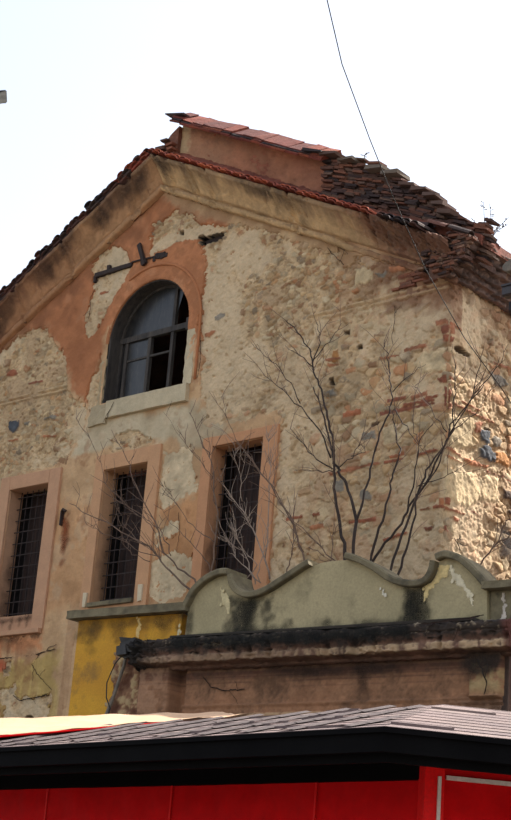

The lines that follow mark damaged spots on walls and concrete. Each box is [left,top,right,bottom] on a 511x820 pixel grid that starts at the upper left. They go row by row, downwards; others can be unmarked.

flaking render [84,246,132,338]
flaking render [0,328,102,488]
flaking render [149,210,511,606]
peeling [220,587,231,614]
damp [229,597,256,632]
damp [397,587,429,622]
flaking render [0,659,52,718]
crack [0,645,55,701]
crack [203,677,243,704]
damp [464,652,501,674]